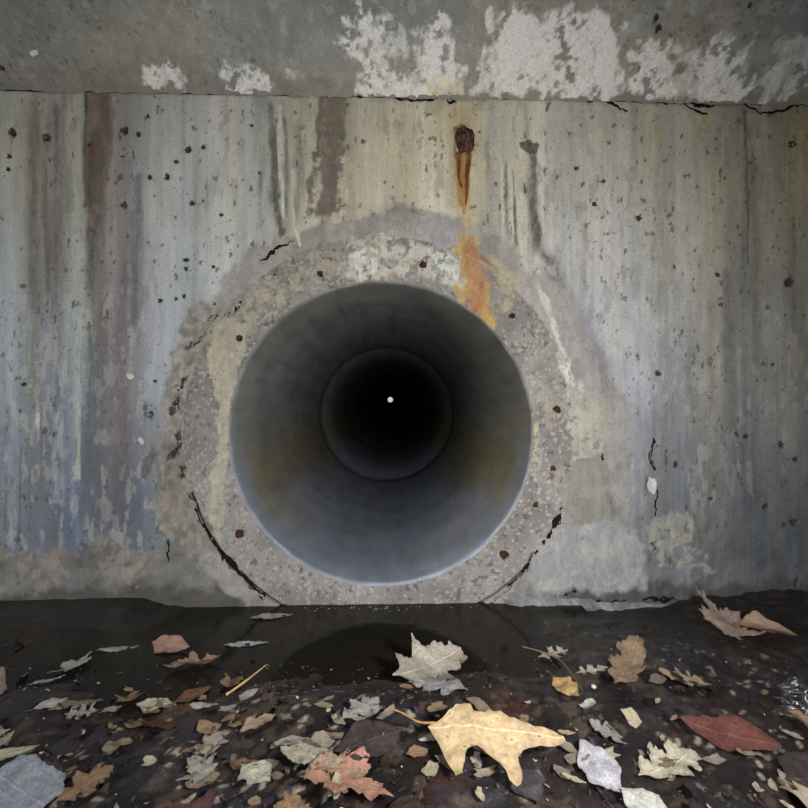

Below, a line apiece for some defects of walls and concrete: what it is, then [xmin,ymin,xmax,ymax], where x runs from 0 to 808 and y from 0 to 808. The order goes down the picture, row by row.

crack [394,96,457,104]
crack [587,101,628,112]
crack [663,102,715,115]
crack [744,103,806,115]
corrosion [424,99,524,329]
crack [260,241,294,263]
damp [0,0,808,563]
crack [189,301,242,347]
crack [175,445,266,600]
crack [490,505,564,603]
damp [625,502,670,598]